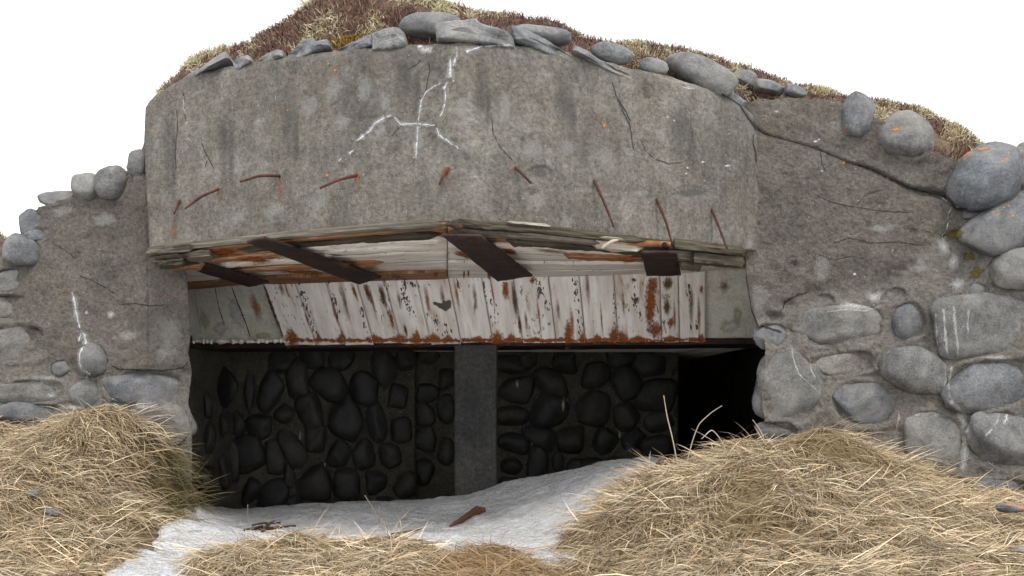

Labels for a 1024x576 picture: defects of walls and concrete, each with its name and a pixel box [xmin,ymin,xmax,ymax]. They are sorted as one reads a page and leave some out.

crack [612,82,682,164]
crack [722,94,968,213]
rust [213,249,268,263]
crack [818,237,925,260]
peeling [387,274,453,336]
rust [264,278,705,346]